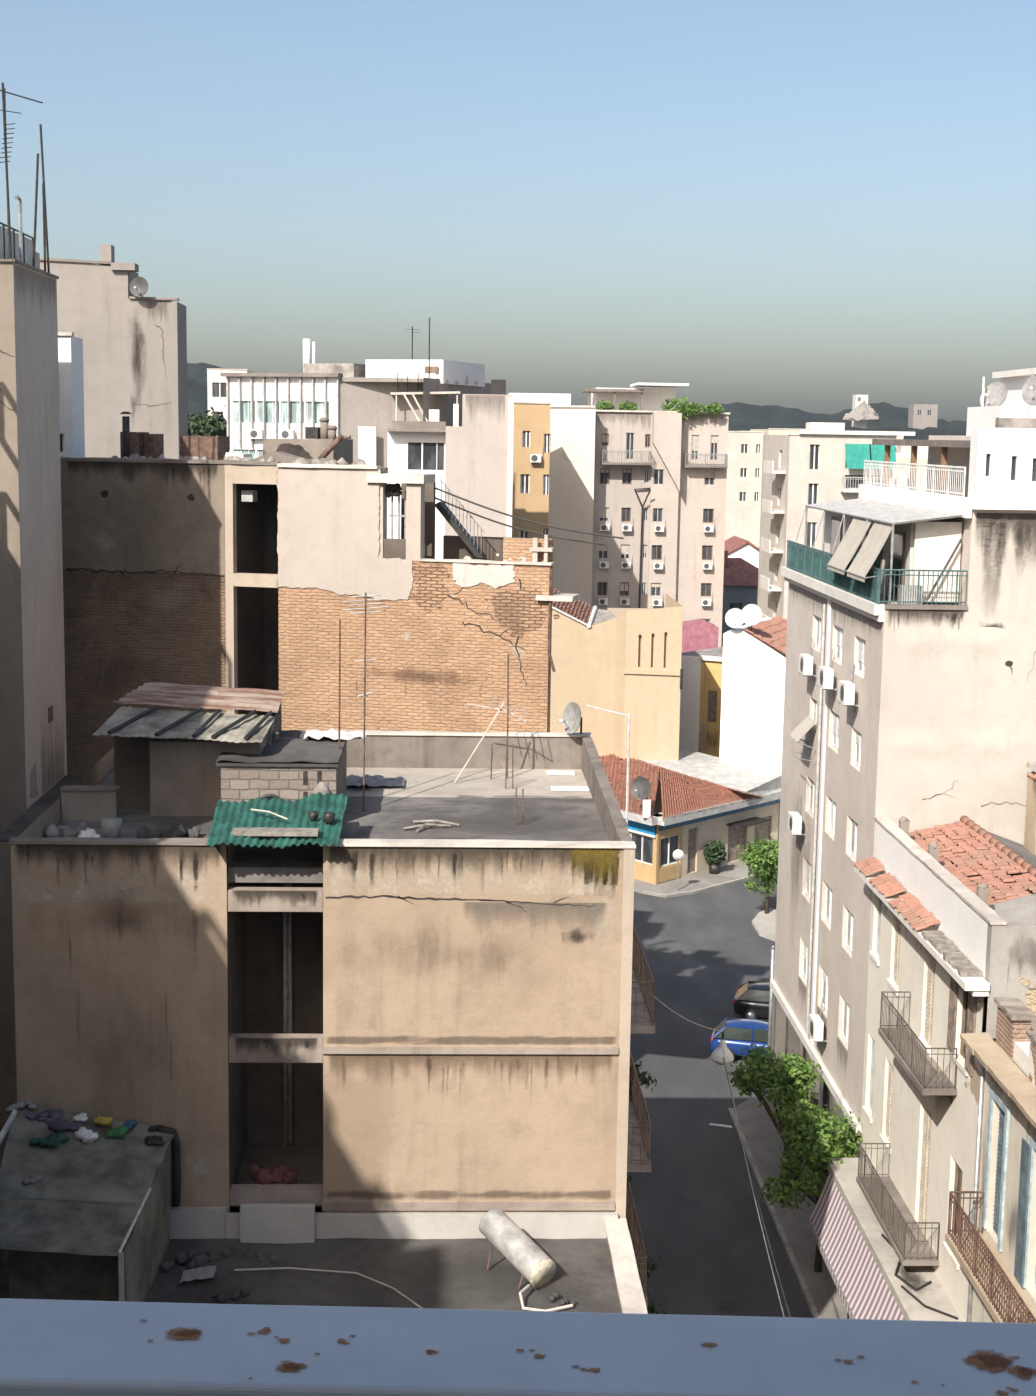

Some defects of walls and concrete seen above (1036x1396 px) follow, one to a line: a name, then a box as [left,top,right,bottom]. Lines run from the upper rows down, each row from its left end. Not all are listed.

leakage [977,513,1036,552]
spalling [410,562,456,614]
spalling [485,586,560,638]
crack [448,587,527,686]
leakage [17,844,220,900]
leakage [235,846,609,905]
crack [325,895,591,912]
corrosion [148,1327,202,1342]
corrosion [247,1327,290,1343]
corrosion [276,1353,320,1372]
corrosion [964,1351,1036,1396]